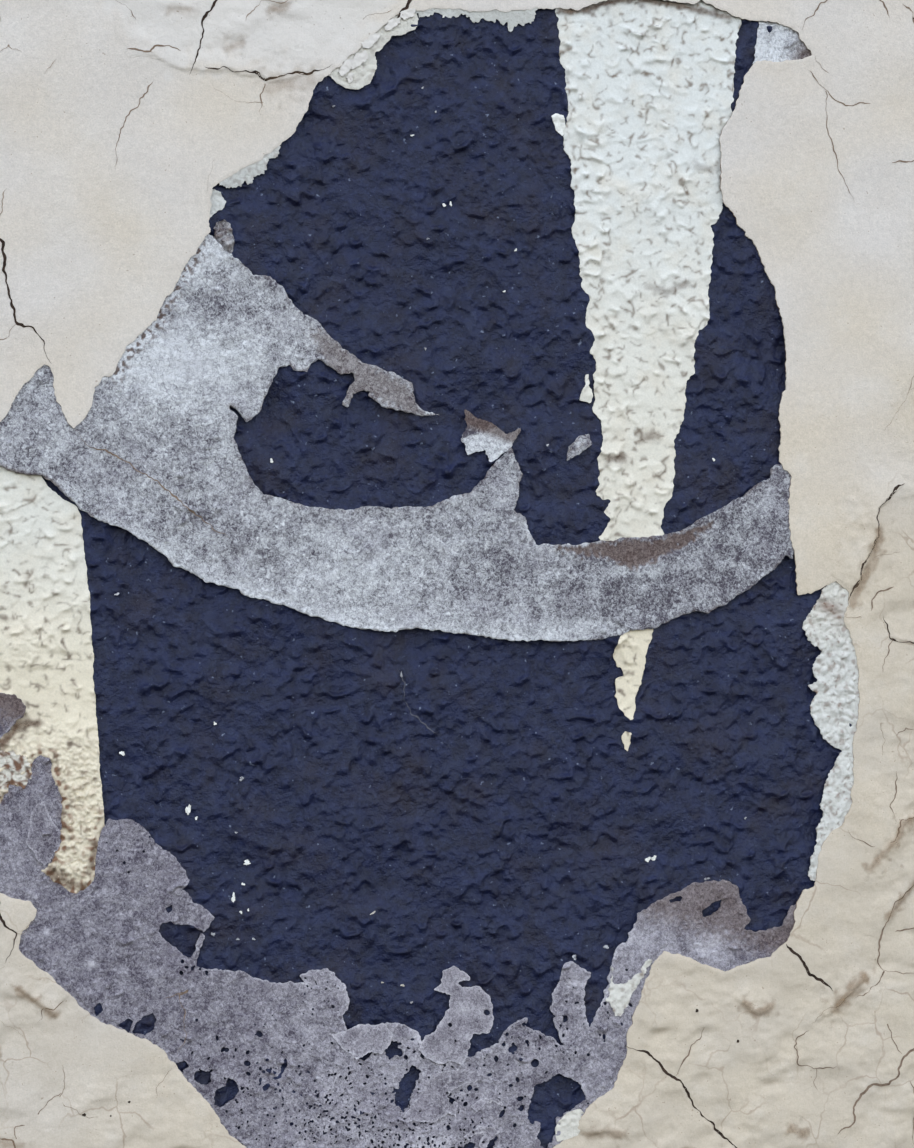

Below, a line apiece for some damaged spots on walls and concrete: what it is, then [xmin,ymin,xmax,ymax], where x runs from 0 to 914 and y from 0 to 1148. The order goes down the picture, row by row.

crack [128,0,331,104]
crack [367,0,412,18]
crack [115,82,153,164]
crack [810,58,871,197]
crack [0,190,51,363]
crack [847,484,914,665]
flaking render [0,693,26,739]
spalling [0,750,31,790]
crack [786,886,914,1091]
crack [628,1029,737,1148]
crack [837,1024,914,1135]